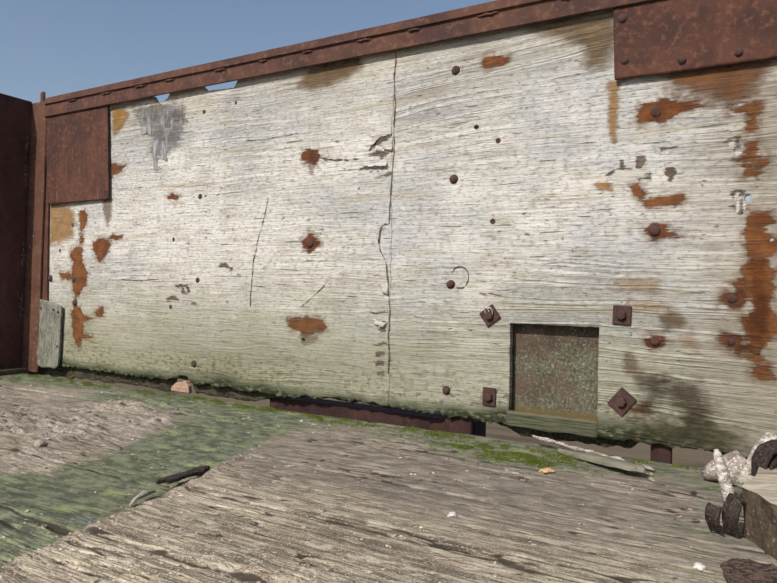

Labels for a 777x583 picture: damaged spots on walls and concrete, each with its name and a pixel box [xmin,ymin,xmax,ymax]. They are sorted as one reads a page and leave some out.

rust [482,55,510,68]
rust [606,81,620,143]
rust [636,62,771,177]
rust [300,148,320,165]
rust [59,210,123,347]
crack [245,200,268,305]
rust [286,315,327,335]
rust [301,233,320,254]
crack [322,55,401,372]
rust [630,183,686,209]
rust [717,211,777,381]